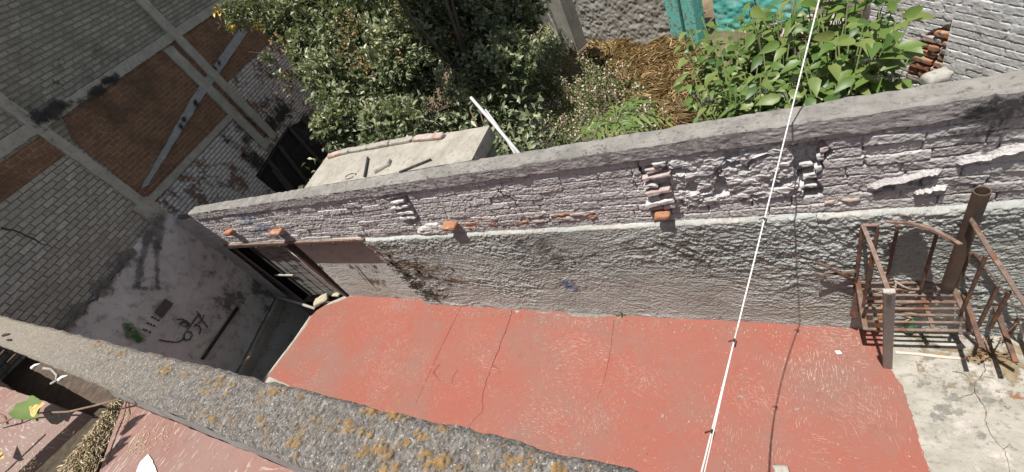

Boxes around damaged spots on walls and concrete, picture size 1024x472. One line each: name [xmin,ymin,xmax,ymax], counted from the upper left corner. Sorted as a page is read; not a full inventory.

damp [27,60,120,141]
peeling [642,140,829,211]
spalling [390,196,419,220]
spalling [464,211,597,229]
damp [580,222,646,231]
damp [692,215,769,226]
damp [799,208,928,219]
damp [391,248,468,301]
crack [468,310,512,427]
crack [953,361,1017,470]